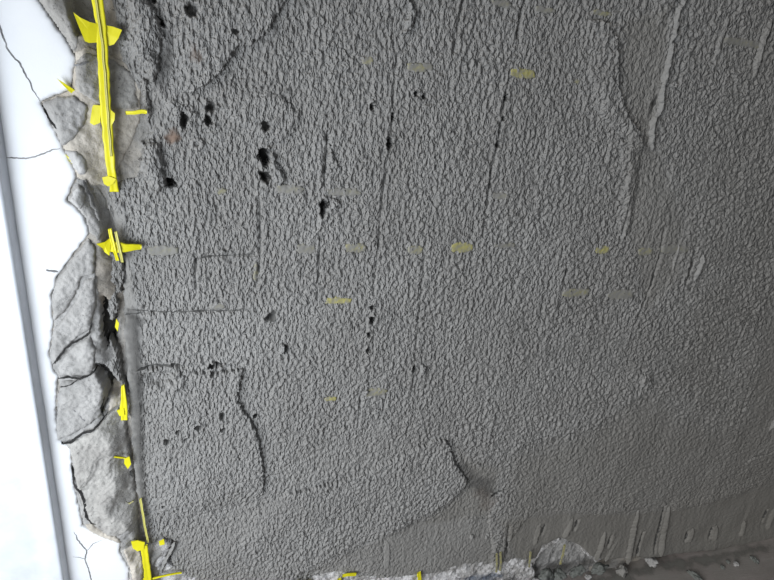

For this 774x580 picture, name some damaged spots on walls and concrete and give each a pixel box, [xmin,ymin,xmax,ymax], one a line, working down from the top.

crack [0,26,56,129]
crack [6,148,60,159]
crack [374,8,396,280]
crack [482,83,508,237]
spalling [39,0,144,580]
crack [53,322,99,387]
crack [137,363,185,371]
crack [55,397,108,445]
peeling [150,537,172,570]
spalling [531,538,602,576]